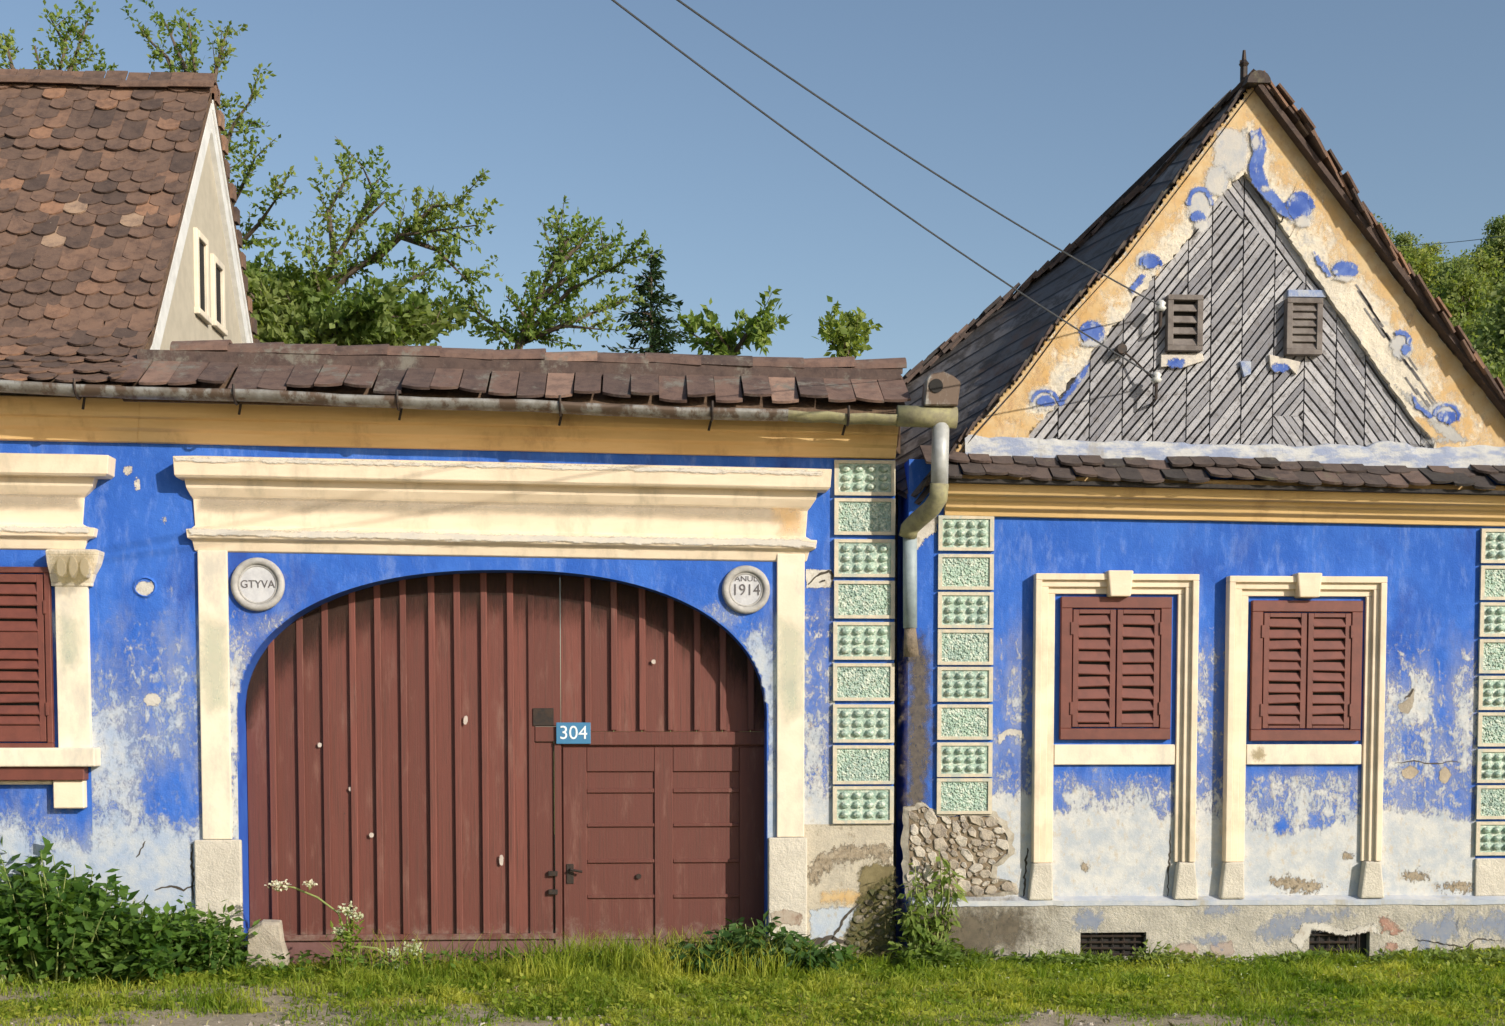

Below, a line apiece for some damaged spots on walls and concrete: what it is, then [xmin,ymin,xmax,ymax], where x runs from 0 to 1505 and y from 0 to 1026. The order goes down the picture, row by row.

peeling [1287,290,1326,298]
peeling [0,632,204,926]
flaking render [742,568,893,963]
peeling [992,639,1033,896]
peeling [1052,770,1176,930]
peeling [1167,648,1505,958]